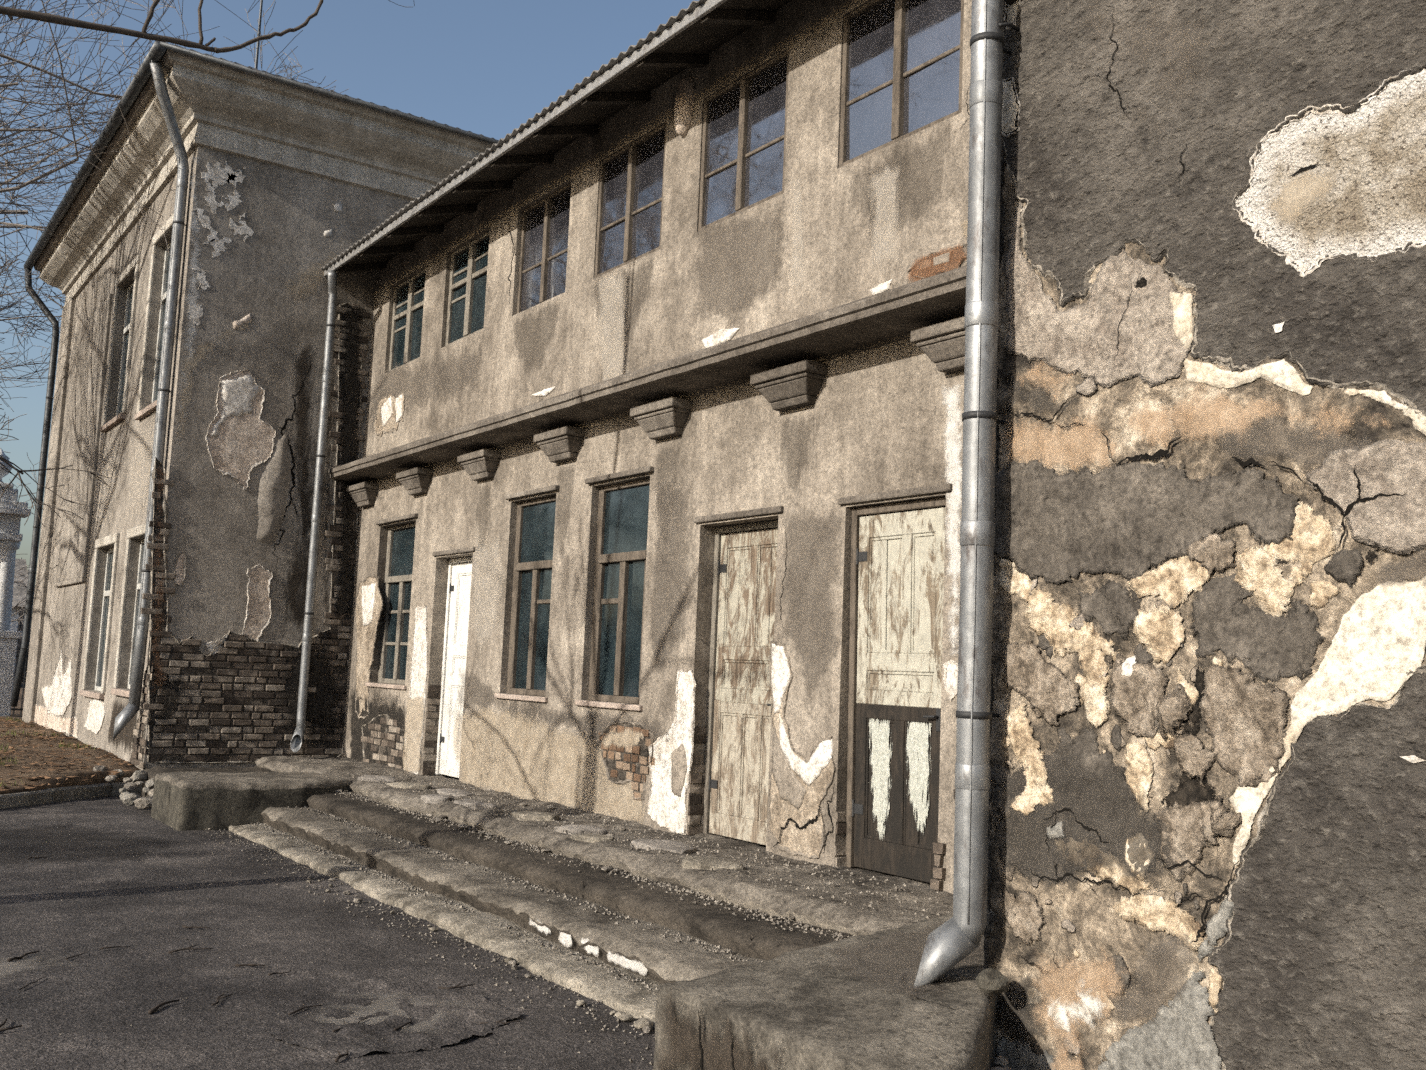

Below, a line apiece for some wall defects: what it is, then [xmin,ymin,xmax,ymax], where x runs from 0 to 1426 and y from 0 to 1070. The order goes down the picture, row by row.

crack [1080,3,1140,124]
water stain [600,278,626,381]
water stain [700,180,802,312]
rust [909,246,964,282]
crack [273,353,313,566]
spalling [130,303,707,835]
flaking render [986,65,1426,1070]
flaking render [34,650,105,738]
flaking render [767,641,847,867]
peeling [869,719,946,891]
crack [1022,808,1240,943]
crack [696,1002,735,1070]